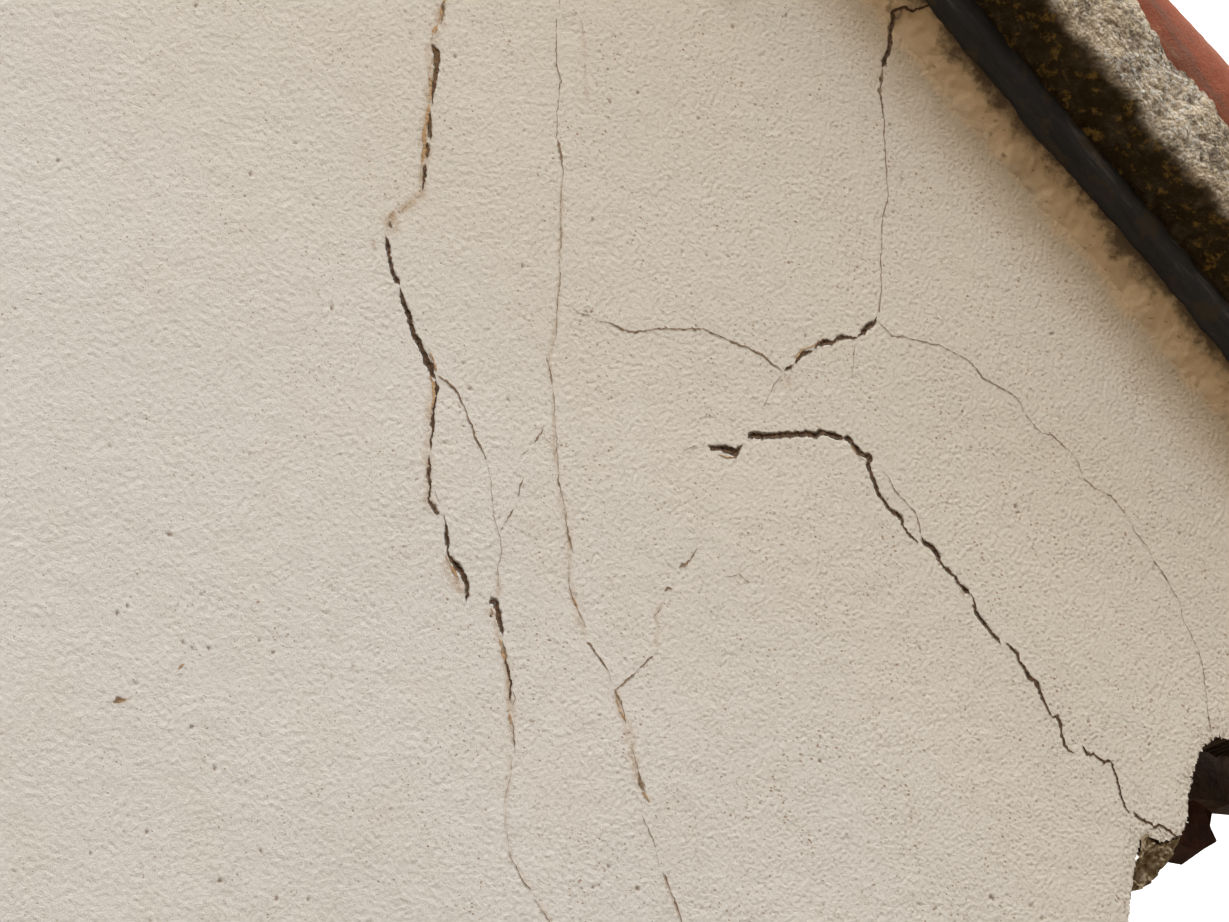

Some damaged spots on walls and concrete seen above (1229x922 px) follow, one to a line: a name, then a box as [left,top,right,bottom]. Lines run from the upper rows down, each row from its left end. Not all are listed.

crack [385,0,1213,922]
spalling [1131,832,1183,892]